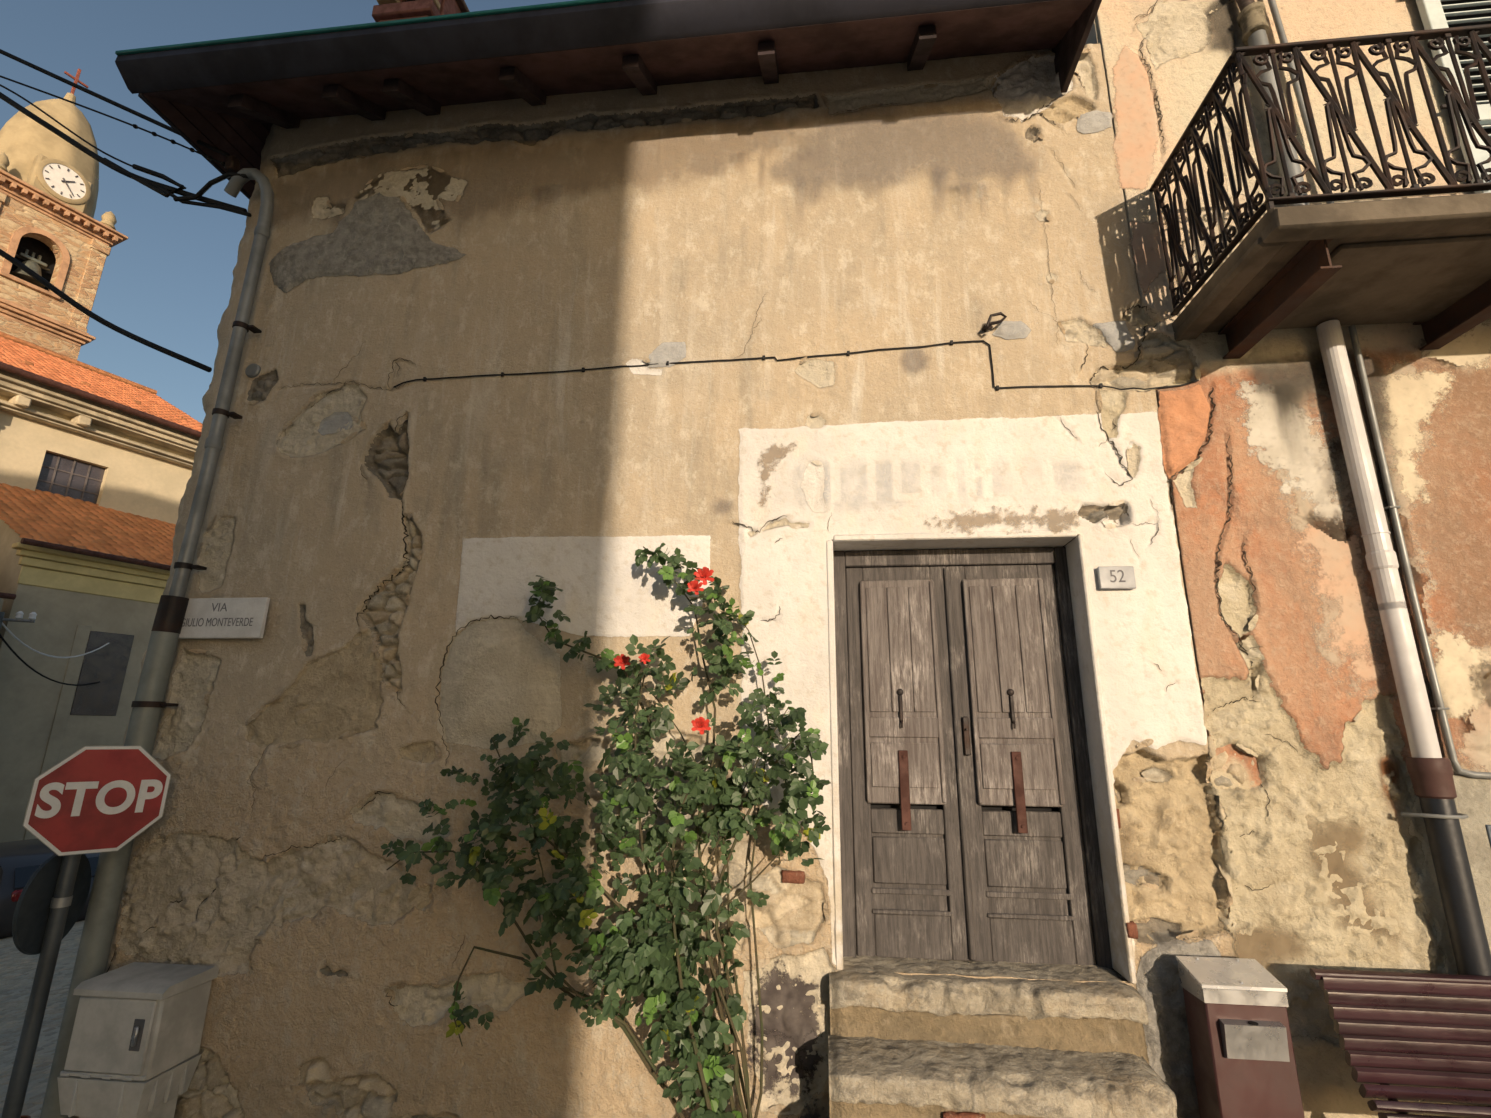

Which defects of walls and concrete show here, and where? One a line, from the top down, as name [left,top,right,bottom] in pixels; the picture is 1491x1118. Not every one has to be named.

flaking render [270,94,819,230]
flaking render [990,0,1218,189]
flaking render [277,384,423,693]
flaking render [1078,500,1131,529]
flaking render [1089,303,1210,508]
crack [1005,72,1302,756]
flaking render [1380,318,1491,775]
flaking render [1113,381,1446,1044]
leakage [746,959,829,1118]